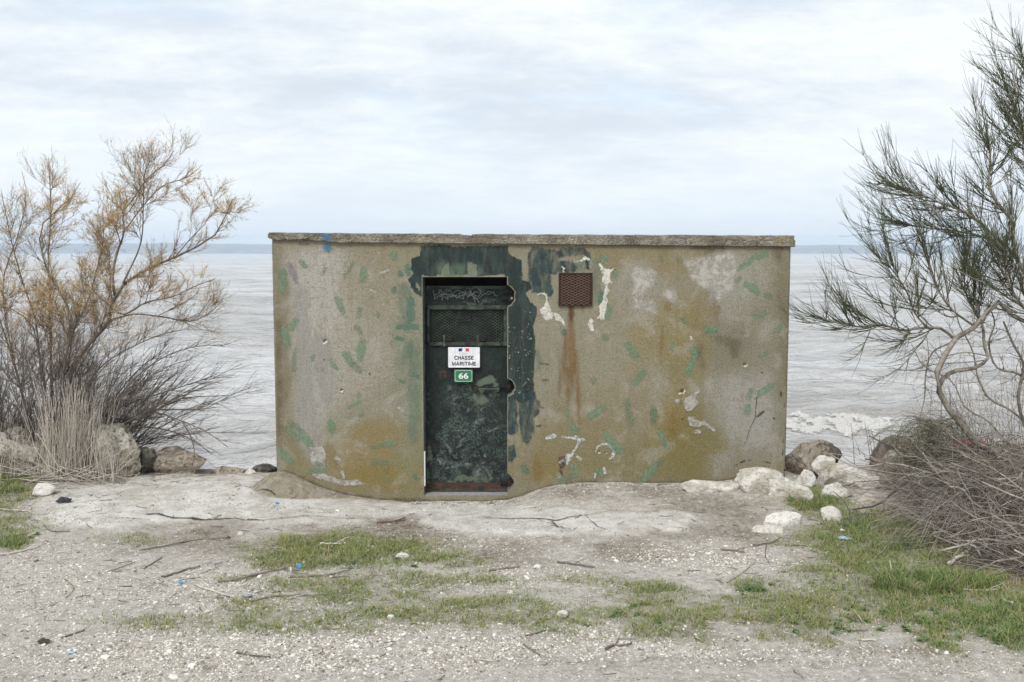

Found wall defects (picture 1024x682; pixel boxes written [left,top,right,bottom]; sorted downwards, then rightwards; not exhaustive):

peeling [537,293,565,326]
peeling [577,257,614,331]
peeling [674,388,716,434]
peeling [310,446,365,486]